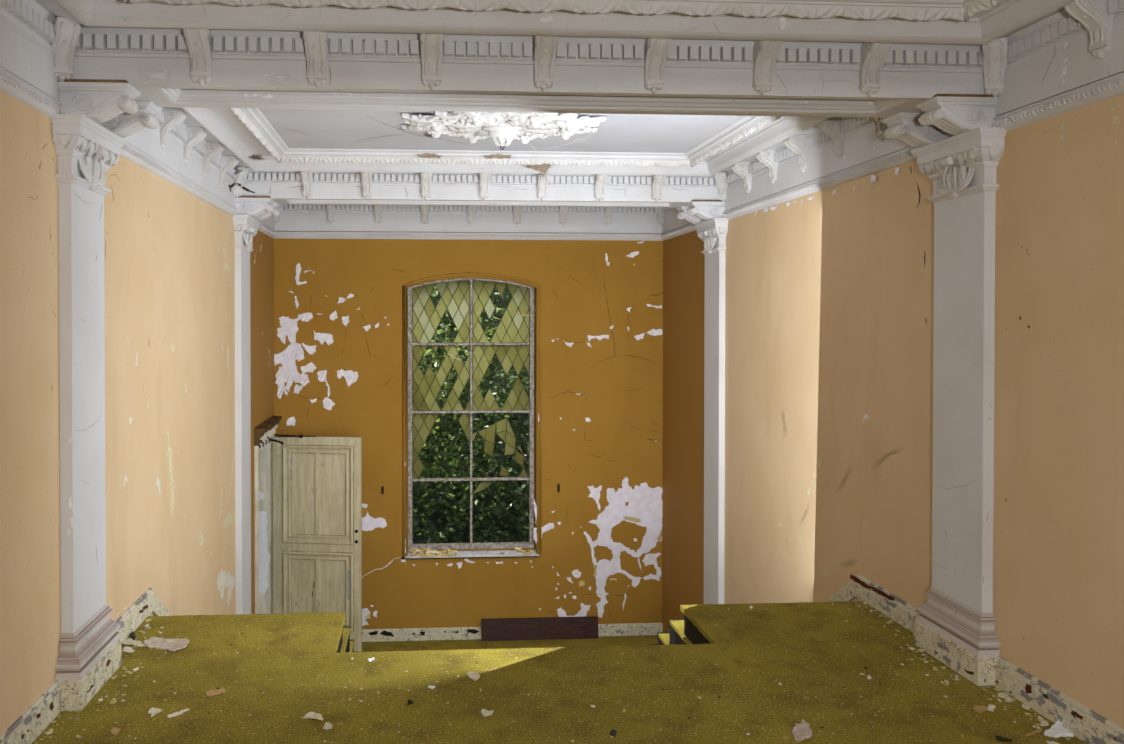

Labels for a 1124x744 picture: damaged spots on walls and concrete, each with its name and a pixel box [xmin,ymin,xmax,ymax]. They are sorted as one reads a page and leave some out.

peeling [269,263,360,410]
peeling [627,327,663,340]
peeling [362,503,387,531]
peeling [533,499,561,543]
peeling [552,477,663,618]